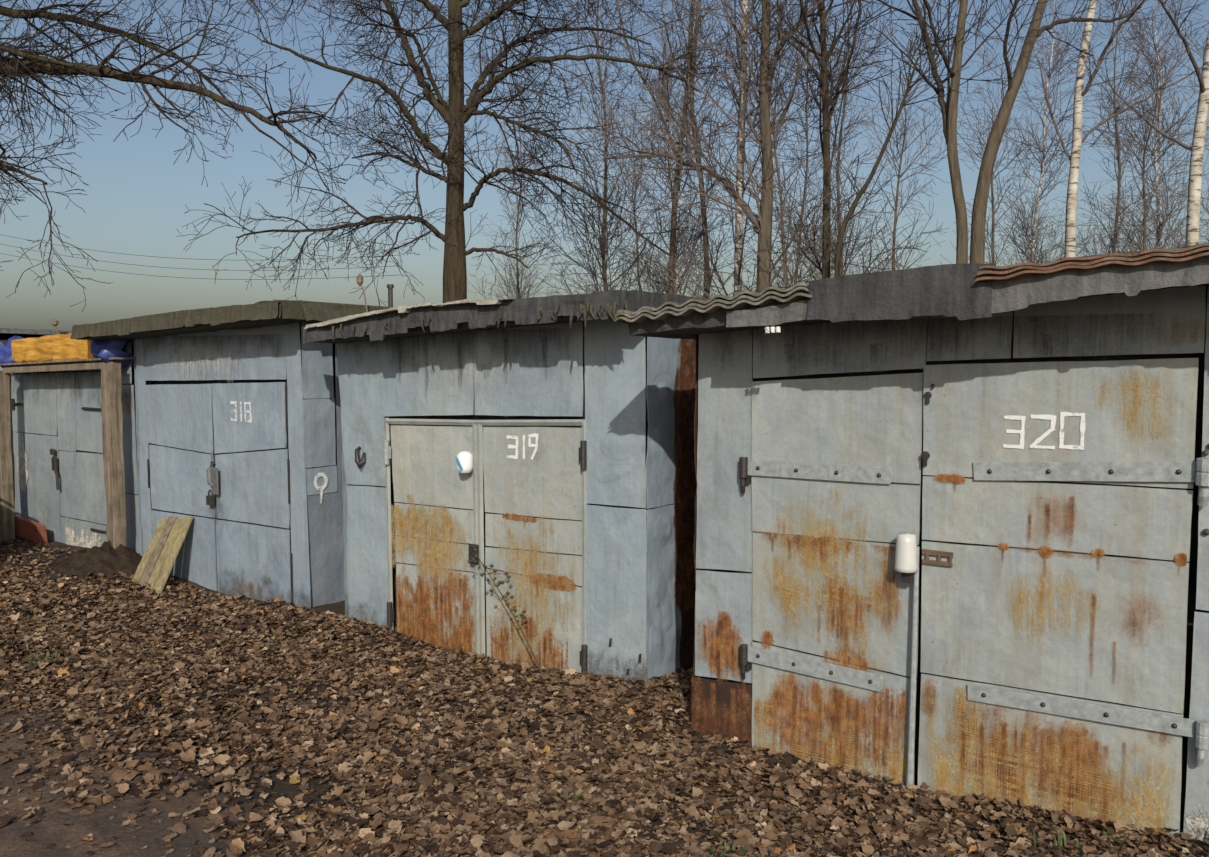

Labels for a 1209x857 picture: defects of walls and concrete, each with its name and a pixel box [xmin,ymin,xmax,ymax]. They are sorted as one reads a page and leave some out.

corrosion [391,494,475,653]
corrosion [490,513,576,671]
corrosion [673,339,696,611]
corrosion [762,488,899,672]
corrosion [935,474,965,487]
corrosion [1012,546,1097,667]
corrosion [1045,496,1075,529]
corrosion [1101,374,1162,438]
corrosion [691,611,908,786]
corrosion [923,682,1171,836]